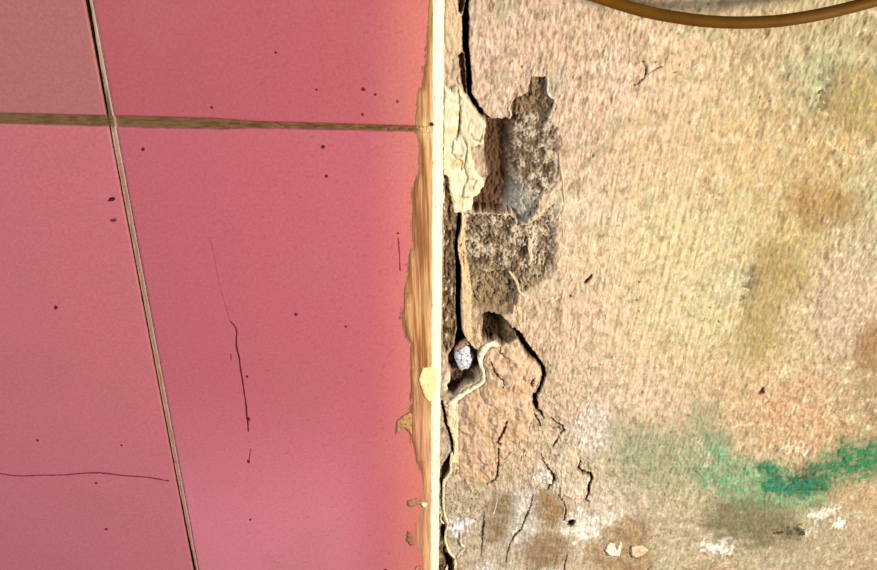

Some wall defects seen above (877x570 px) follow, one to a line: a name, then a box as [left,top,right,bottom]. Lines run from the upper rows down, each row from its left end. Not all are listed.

crack [456,0,511,123]
crack [209,237,251,460]
crack [441,173,467,354]
spalling [419,74,566,402]
crack [0,472,178,481]
crack [438,400,486,570]
crack [505,326,568,563]
water stain [616,407,877,529]